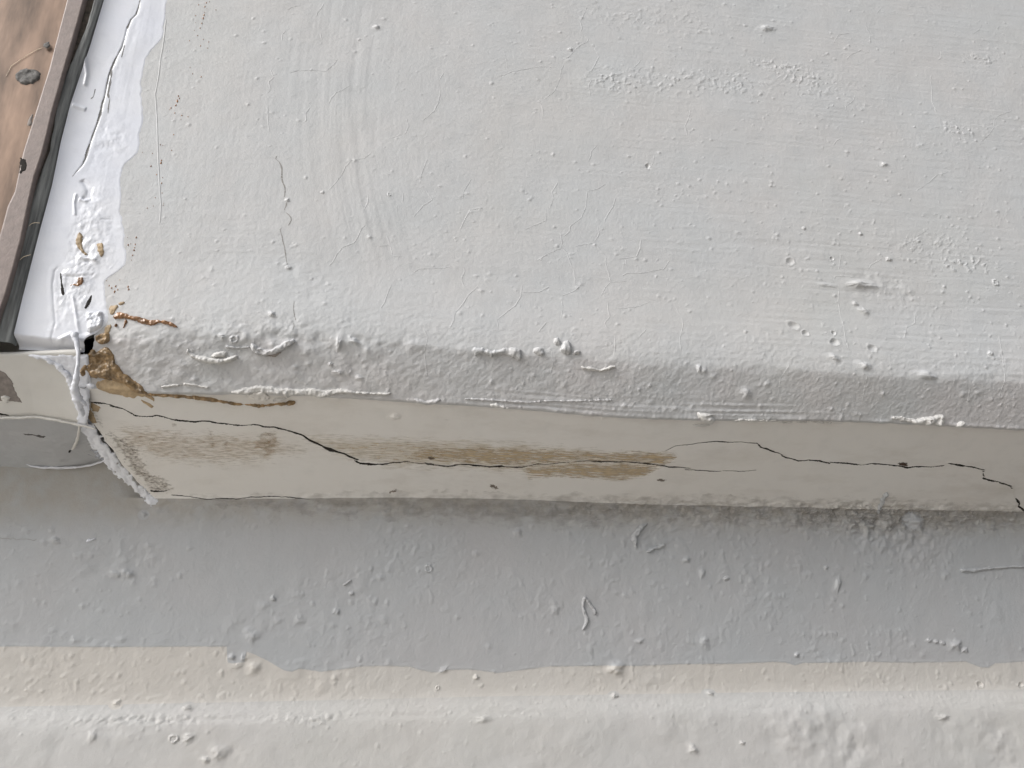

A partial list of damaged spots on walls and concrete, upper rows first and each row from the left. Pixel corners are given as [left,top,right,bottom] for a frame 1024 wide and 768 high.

rust [76,232,104,257]
rust [80,280,296,408]
damp [398,444,676,480]
crack [92,402,1024,511]